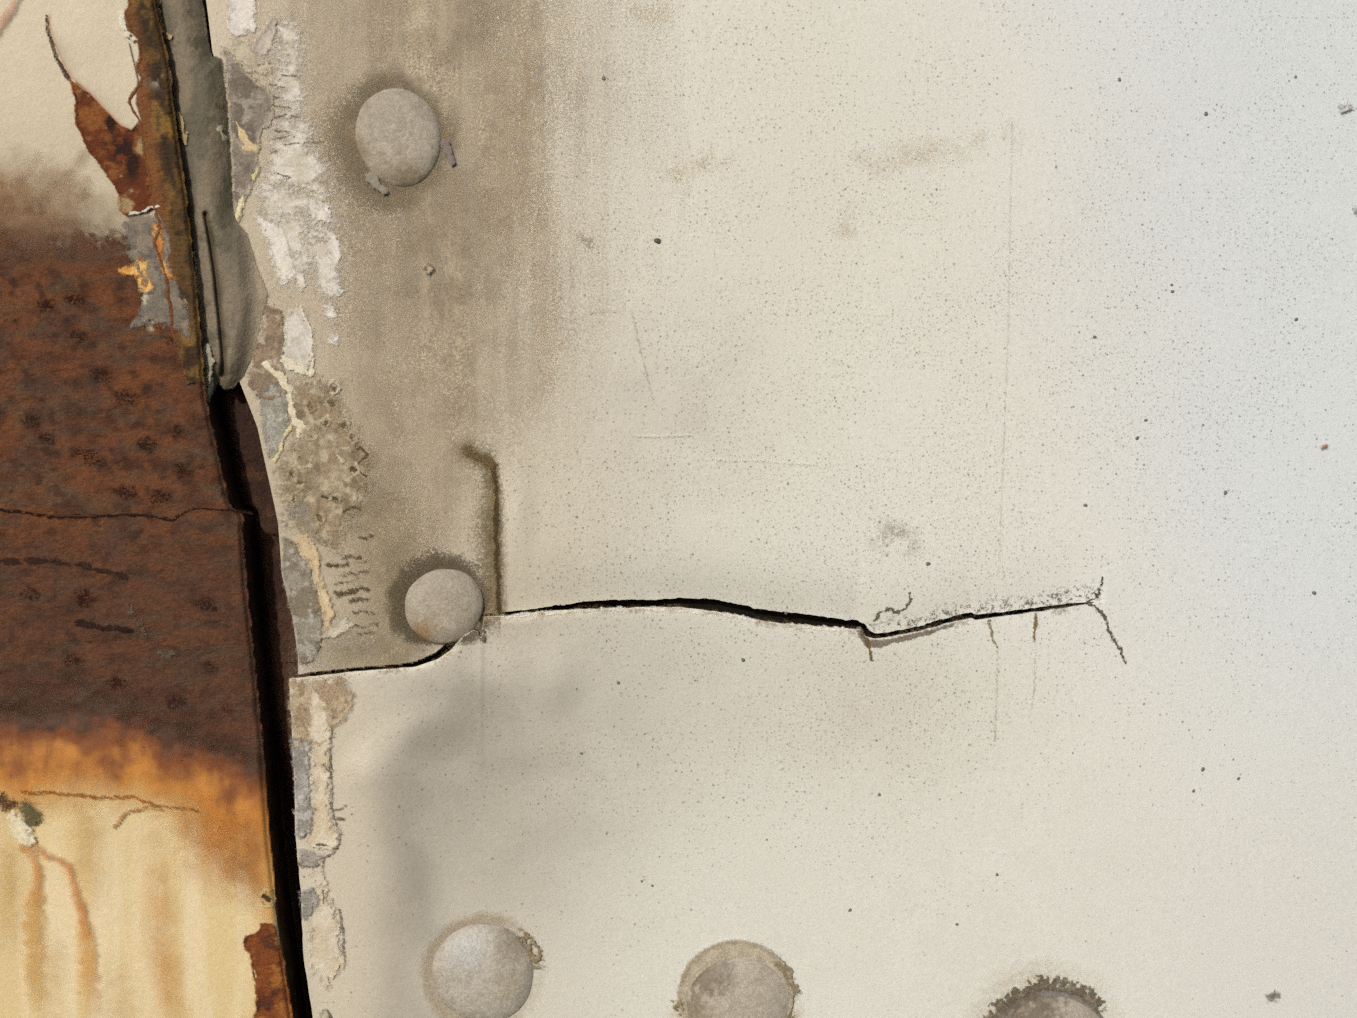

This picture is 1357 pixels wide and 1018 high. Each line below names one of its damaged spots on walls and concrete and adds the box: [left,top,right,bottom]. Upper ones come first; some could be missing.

rust [0,175,293,1018]
peeling [217,0,377,664]
peeling [288,676,355,990]
crack [401,444,1127,667]